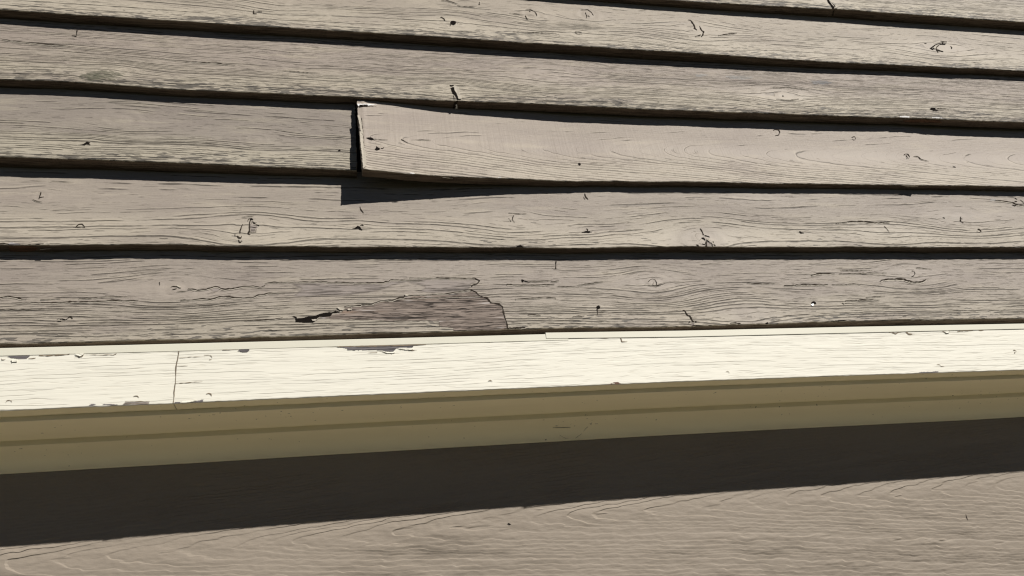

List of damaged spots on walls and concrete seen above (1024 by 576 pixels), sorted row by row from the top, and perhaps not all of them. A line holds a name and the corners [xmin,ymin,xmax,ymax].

peeling [282,277,526,331]
peeling [337,344,426,353]
crack [173,352,203,403]